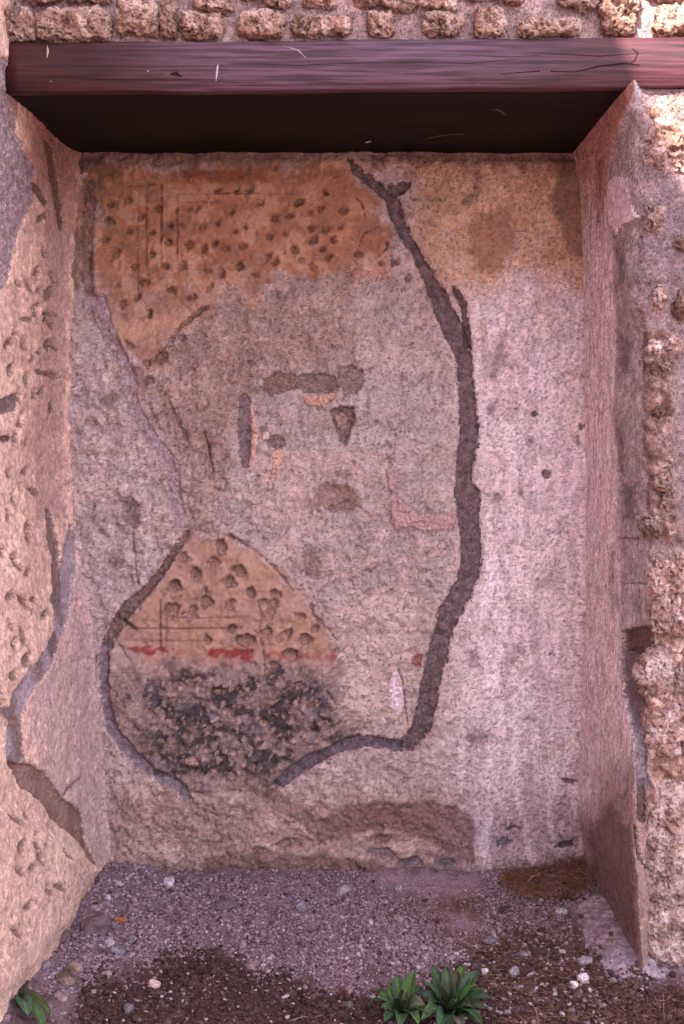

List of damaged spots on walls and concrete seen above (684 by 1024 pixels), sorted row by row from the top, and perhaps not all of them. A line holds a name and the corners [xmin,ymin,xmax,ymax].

spalling [167,269,225,301]
spalling [149,241,247,271]
spalling [267,192,348,271]
spalling [263,365,364,446]
crack [31,140,214,802]
crack [273,158,487,787]
spalling [5,592,46,619]
spalling [161,539,319,670]
crack [228,534,336,639]
spalling [7,624,31,684]
crack [3,509,95,865]
spalling [14,841,48,877]